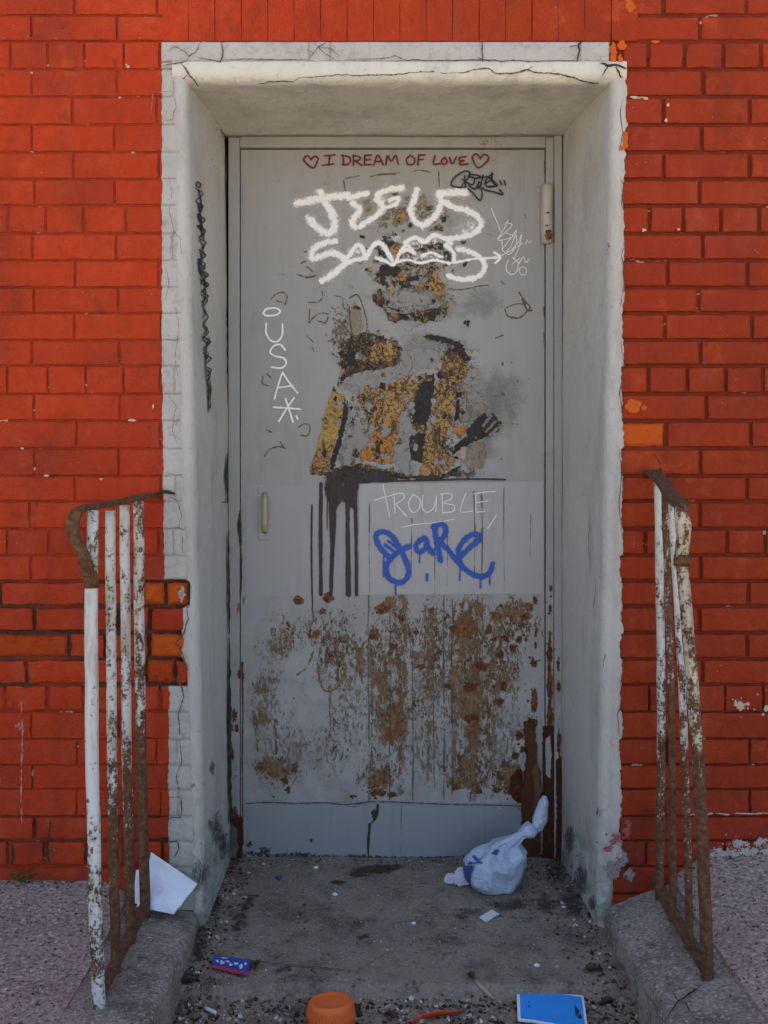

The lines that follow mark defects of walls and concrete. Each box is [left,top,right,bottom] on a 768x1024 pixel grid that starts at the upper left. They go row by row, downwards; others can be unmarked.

crack [151,41,626,149]
crack [607,177,625,303]
peeling [308,291,368,339]
corrosion [231,585,562,860]
flaking render [595,818,636,882]